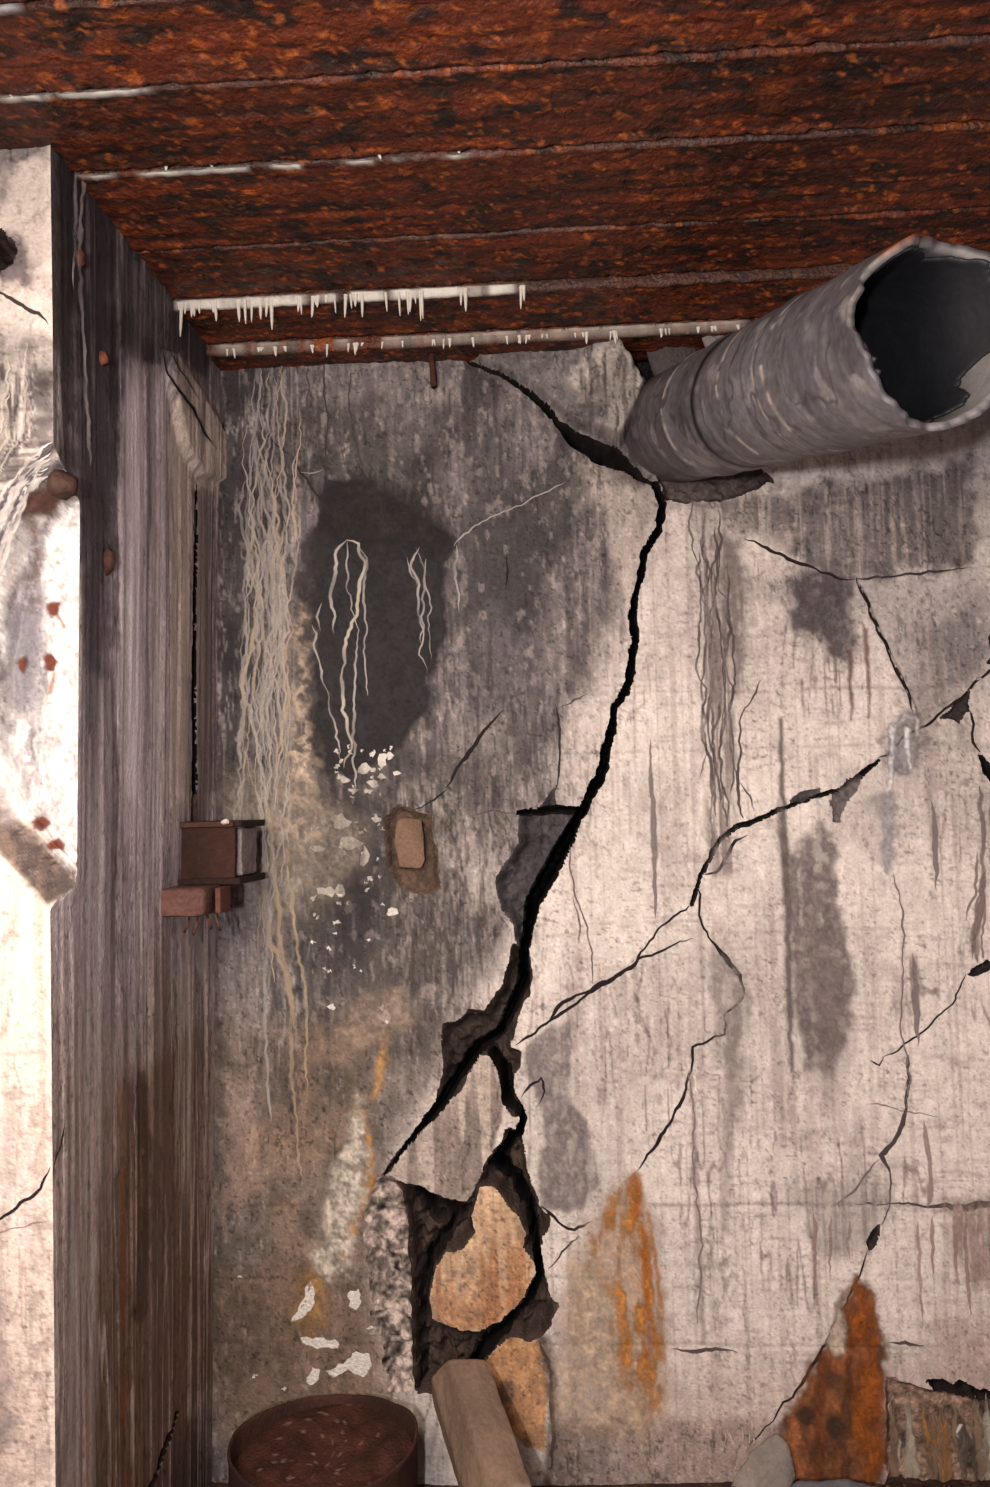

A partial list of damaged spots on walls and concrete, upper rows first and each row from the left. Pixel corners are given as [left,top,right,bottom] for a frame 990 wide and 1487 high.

spalling [0,228,18,272]
damp [176,284,741,358]
damp [0,442,126,974]
damp [237,375,460,1179]
damp [688,498,743,869]
crack [454,362,990,1354]
crack [0,1123,65,1233]
spalling [291,788,592,1469]
corrosion [555,1174,665,1449]
corrosion [779,1275,887,1483]
crack [750,874,990,1444]
spalling [885,1377,990,1483]